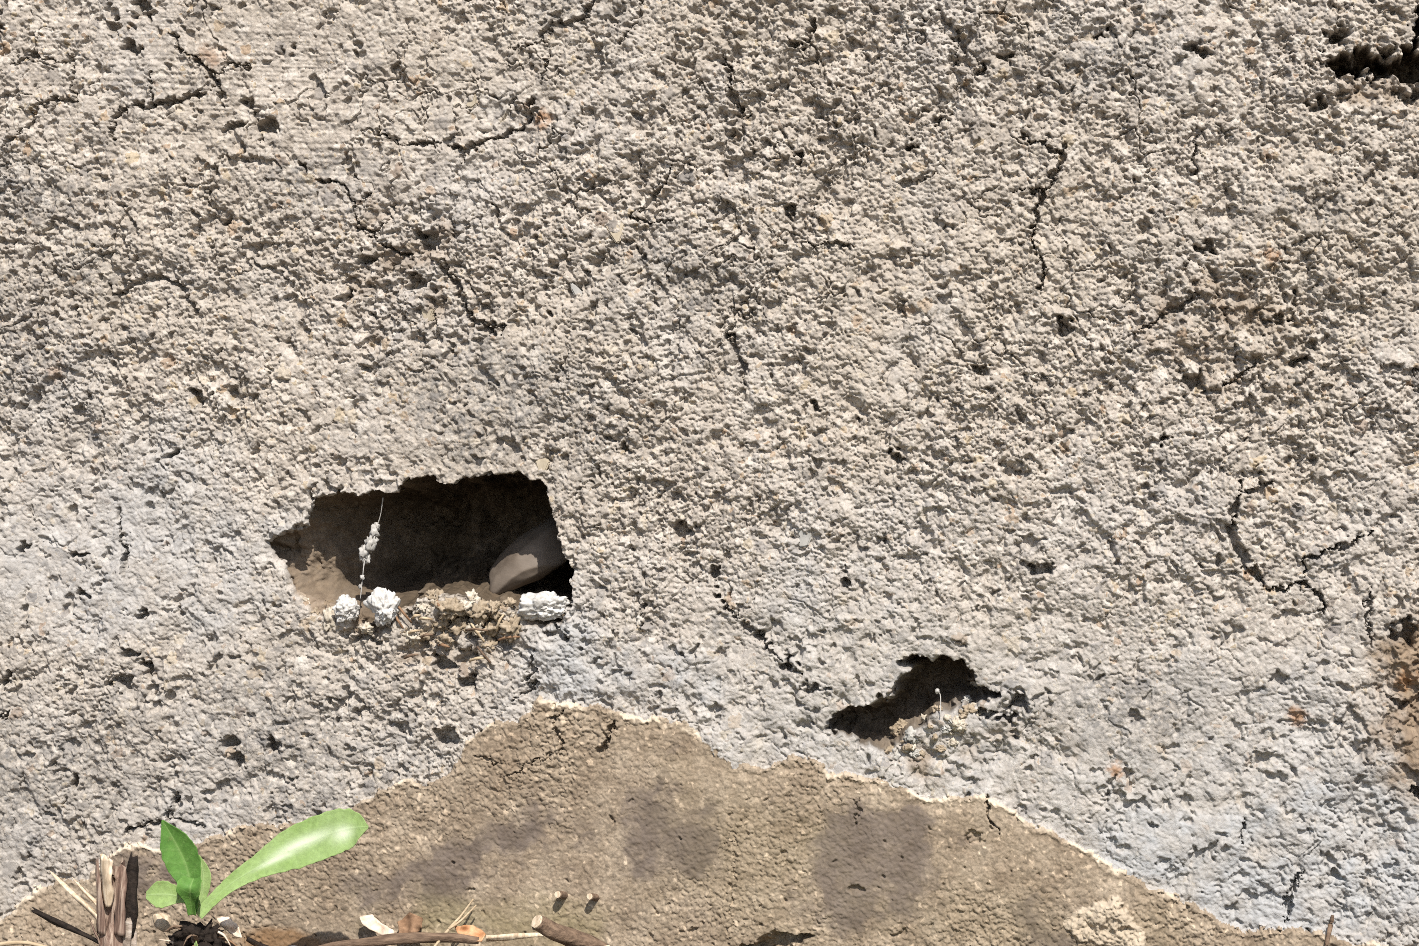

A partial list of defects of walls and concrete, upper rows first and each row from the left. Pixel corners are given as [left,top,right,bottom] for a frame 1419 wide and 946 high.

crack [0,49,80,148]
crack [108,31,252,141]
spalling [1300,4,1419,115]
crack [316,178,507,333]
spalling [264,458,575,674]
spalling [0,842,162,924]
hole [105,672,134,694]
spalling [217,735,241,751]
spalling [194,821,296,848]
spalling [261,733,282,758]
spalling [350,654,1388,946]
spalling [1385,614,1419,799]